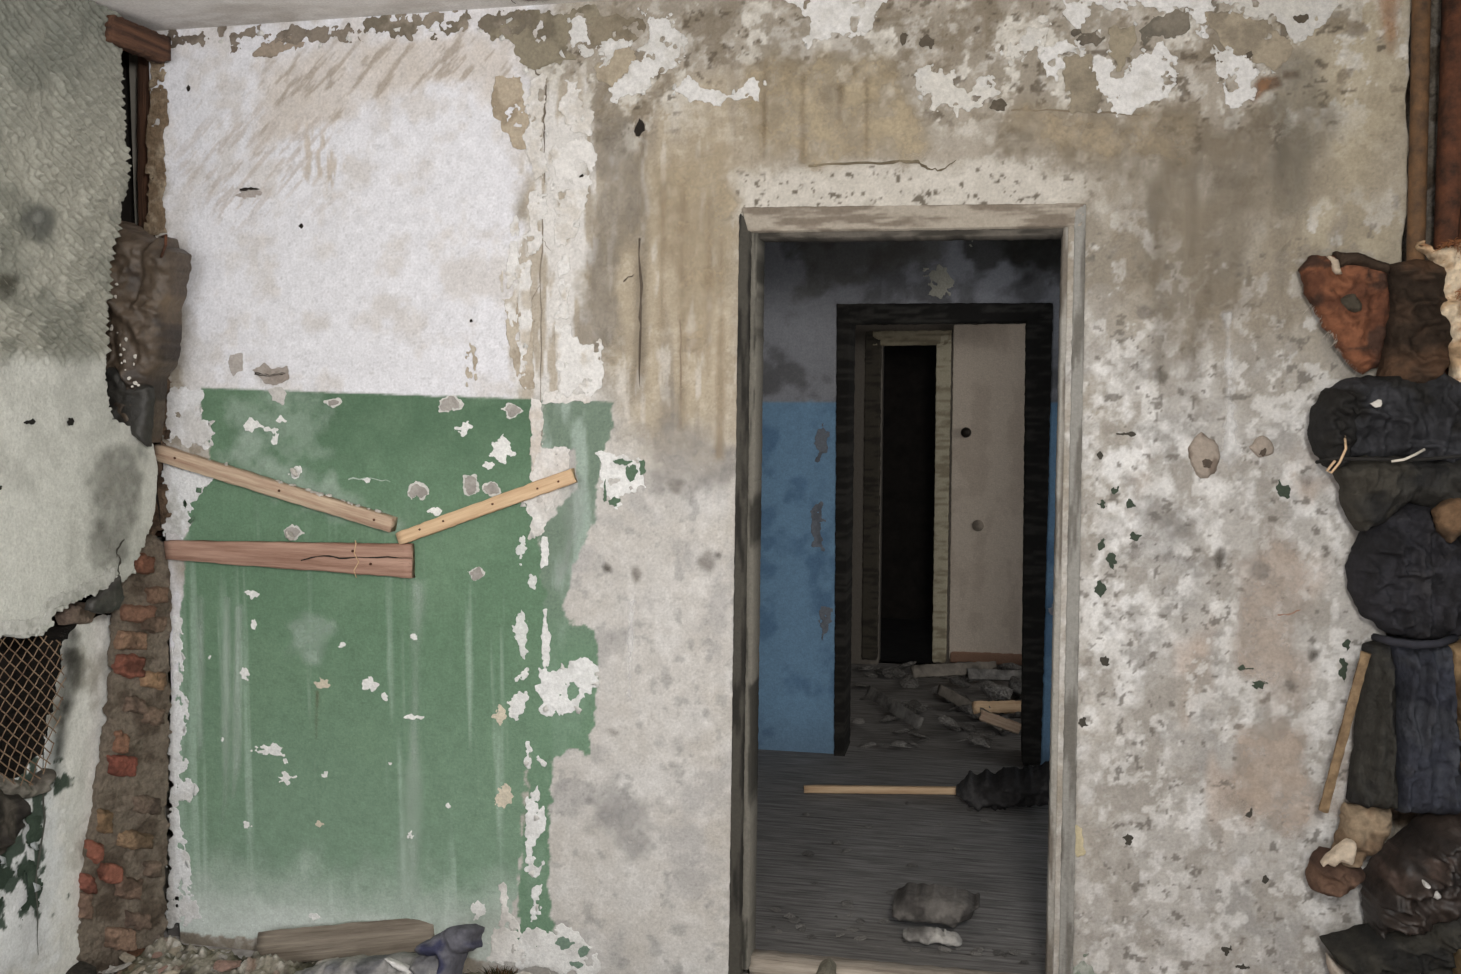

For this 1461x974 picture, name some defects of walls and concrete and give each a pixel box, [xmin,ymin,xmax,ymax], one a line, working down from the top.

peeling [785,0,888,50]
peeling [900,33,1007,118]
peeling [995,0,1339,117]
peeling [144,4,767,590]
spalling [0,375,215,974]
spalling [314,677,331,689]
spalling [362,676,388,701]
peeling [491,608,600,726]
spalling [250,743,297,785]
peeling [470,741,601,974]